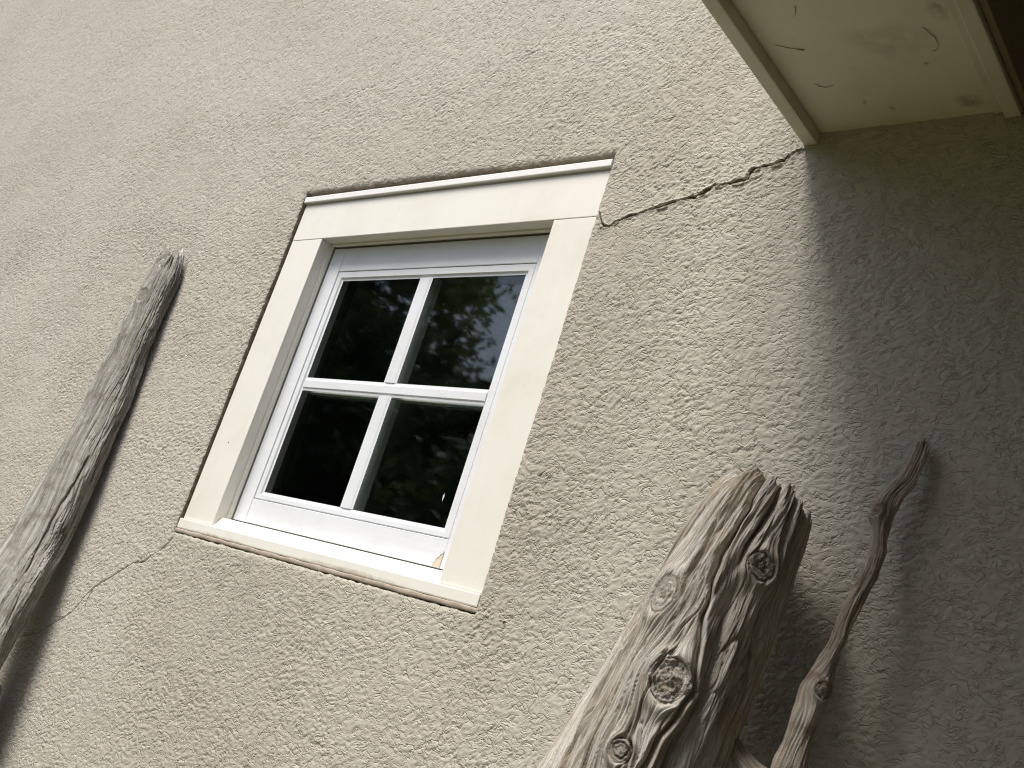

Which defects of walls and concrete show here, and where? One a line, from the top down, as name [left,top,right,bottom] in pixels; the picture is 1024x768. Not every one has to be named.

crack [599,146,806,229]